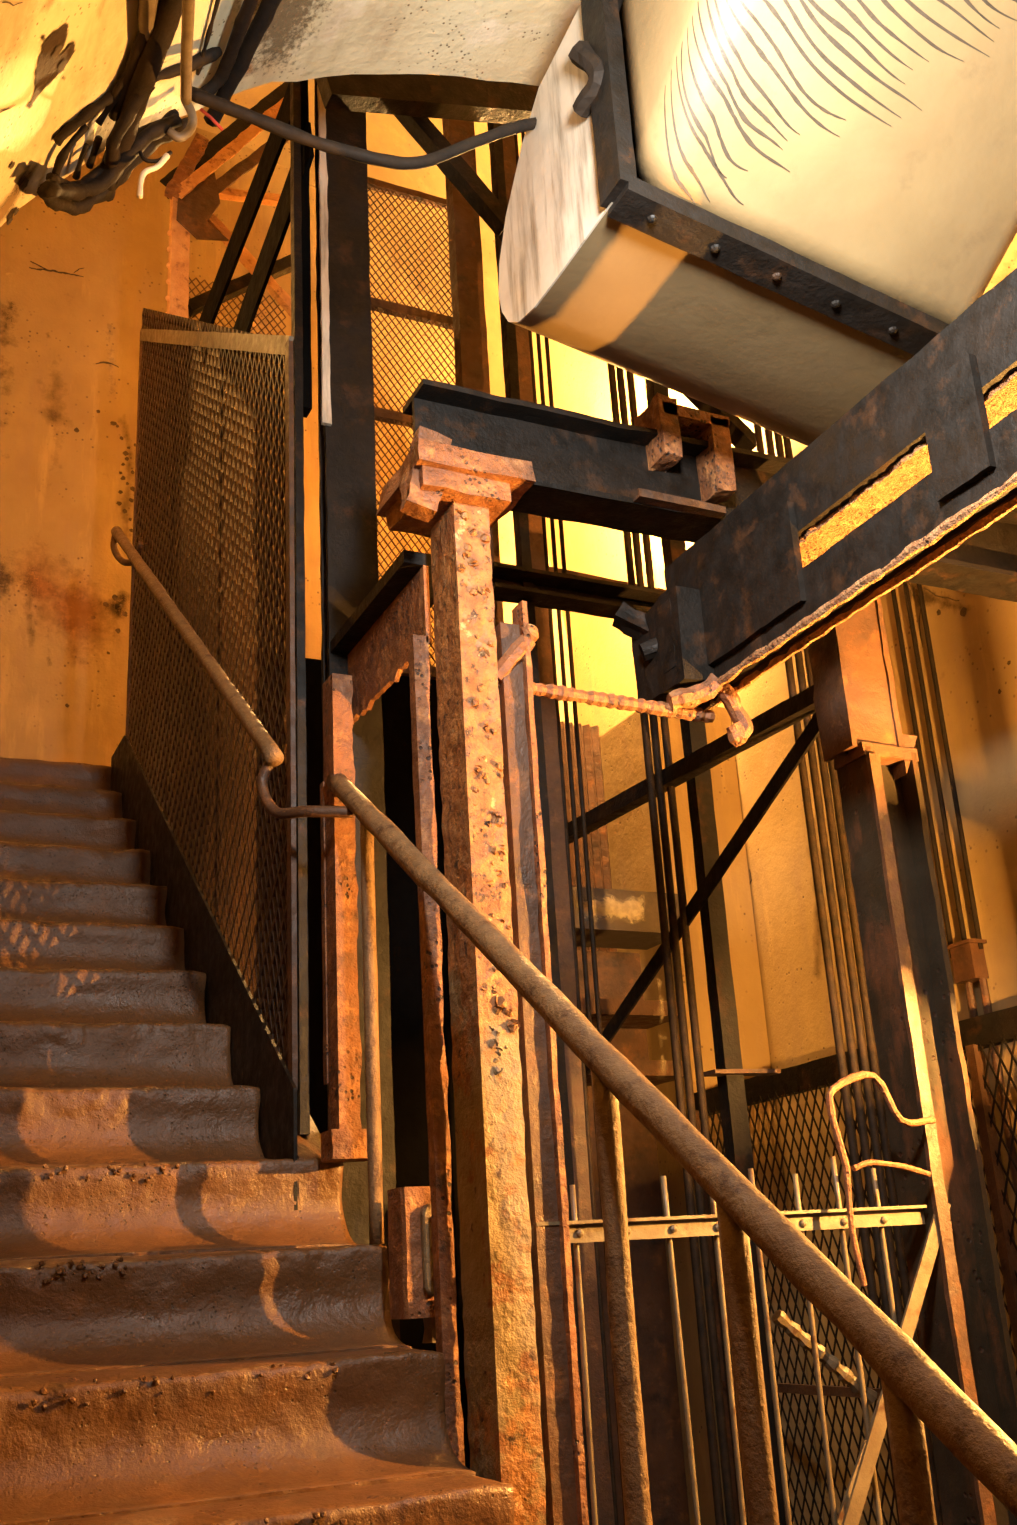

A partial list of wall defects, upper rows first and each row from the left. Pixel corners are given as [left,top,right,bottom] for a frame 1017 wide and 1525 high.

leakage [0,566,12,592]